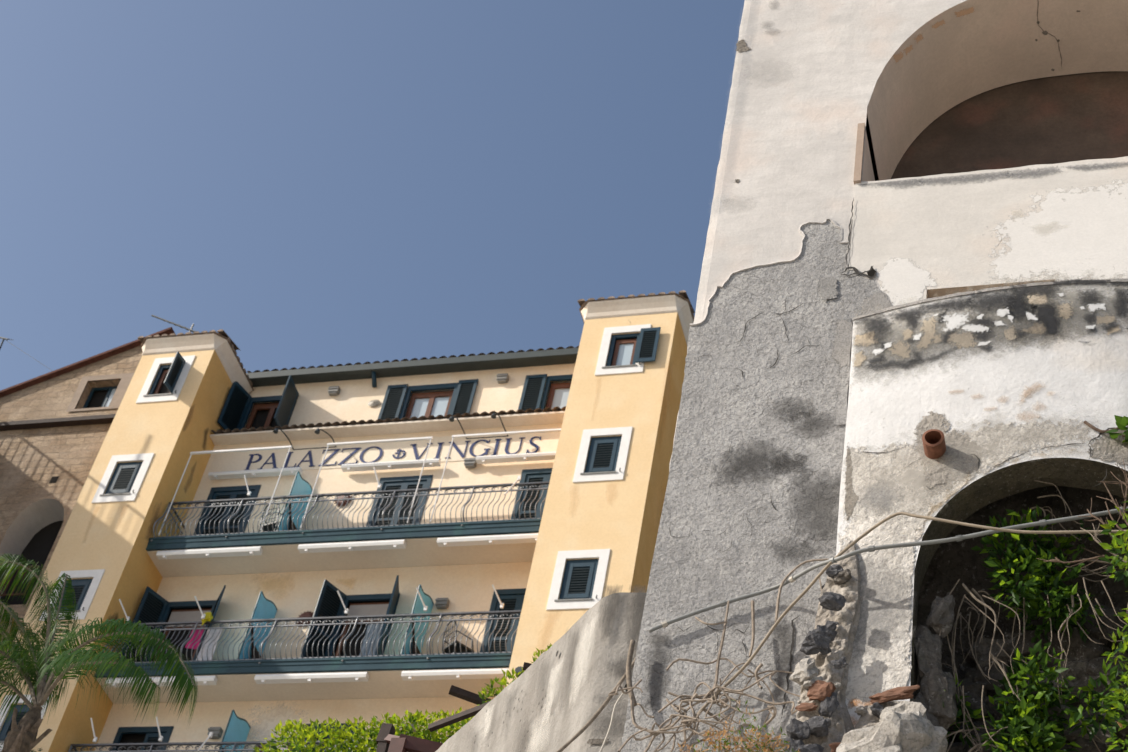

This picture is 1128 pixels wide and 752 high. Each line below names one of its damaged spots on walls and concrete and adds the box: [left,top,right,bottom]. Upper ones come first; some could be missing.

crack [1037,2,1062,67]
crack [698,297,814,376]
water stain [723,444,839,537]
spalling [587,218,1128,752]